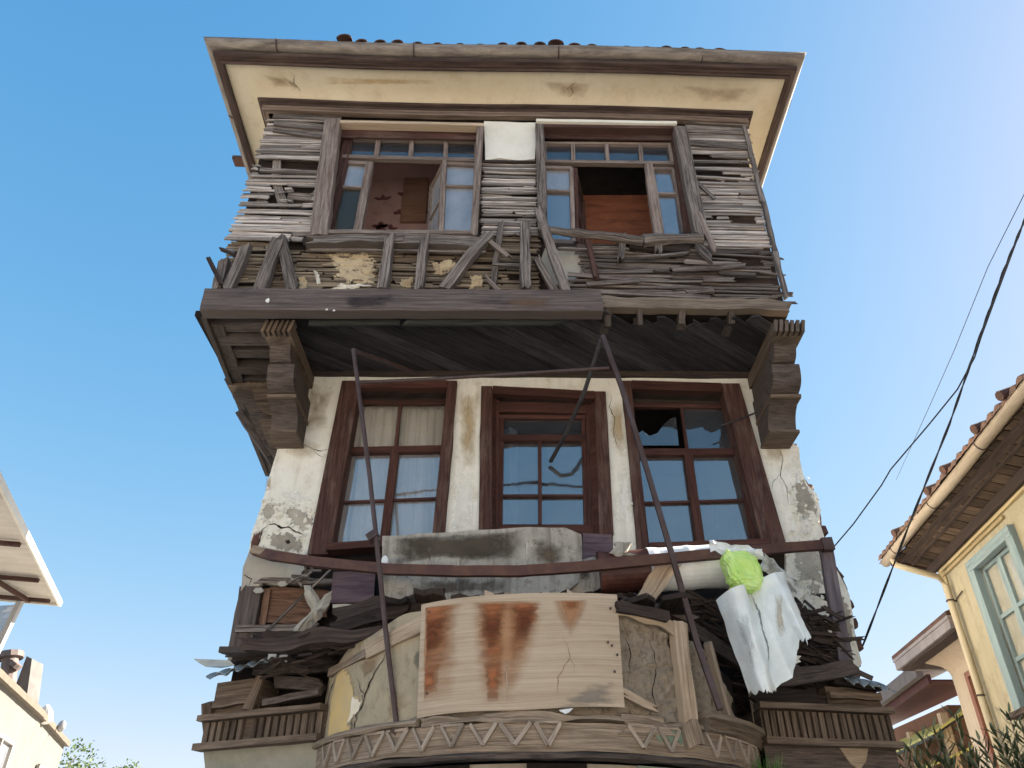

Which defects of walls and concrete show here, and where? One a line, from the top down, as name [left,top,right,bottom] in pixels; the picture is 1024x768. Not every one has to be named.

crack [258,522,304,545]
peeling [251,498,316,555]
leakage [401,534,559,592]
peeling [786,473,828,609]
rust [560,601,581,624]
rust [424,606,451,691]
rust [482,602,536,695]
peeling [328,669,362,736]